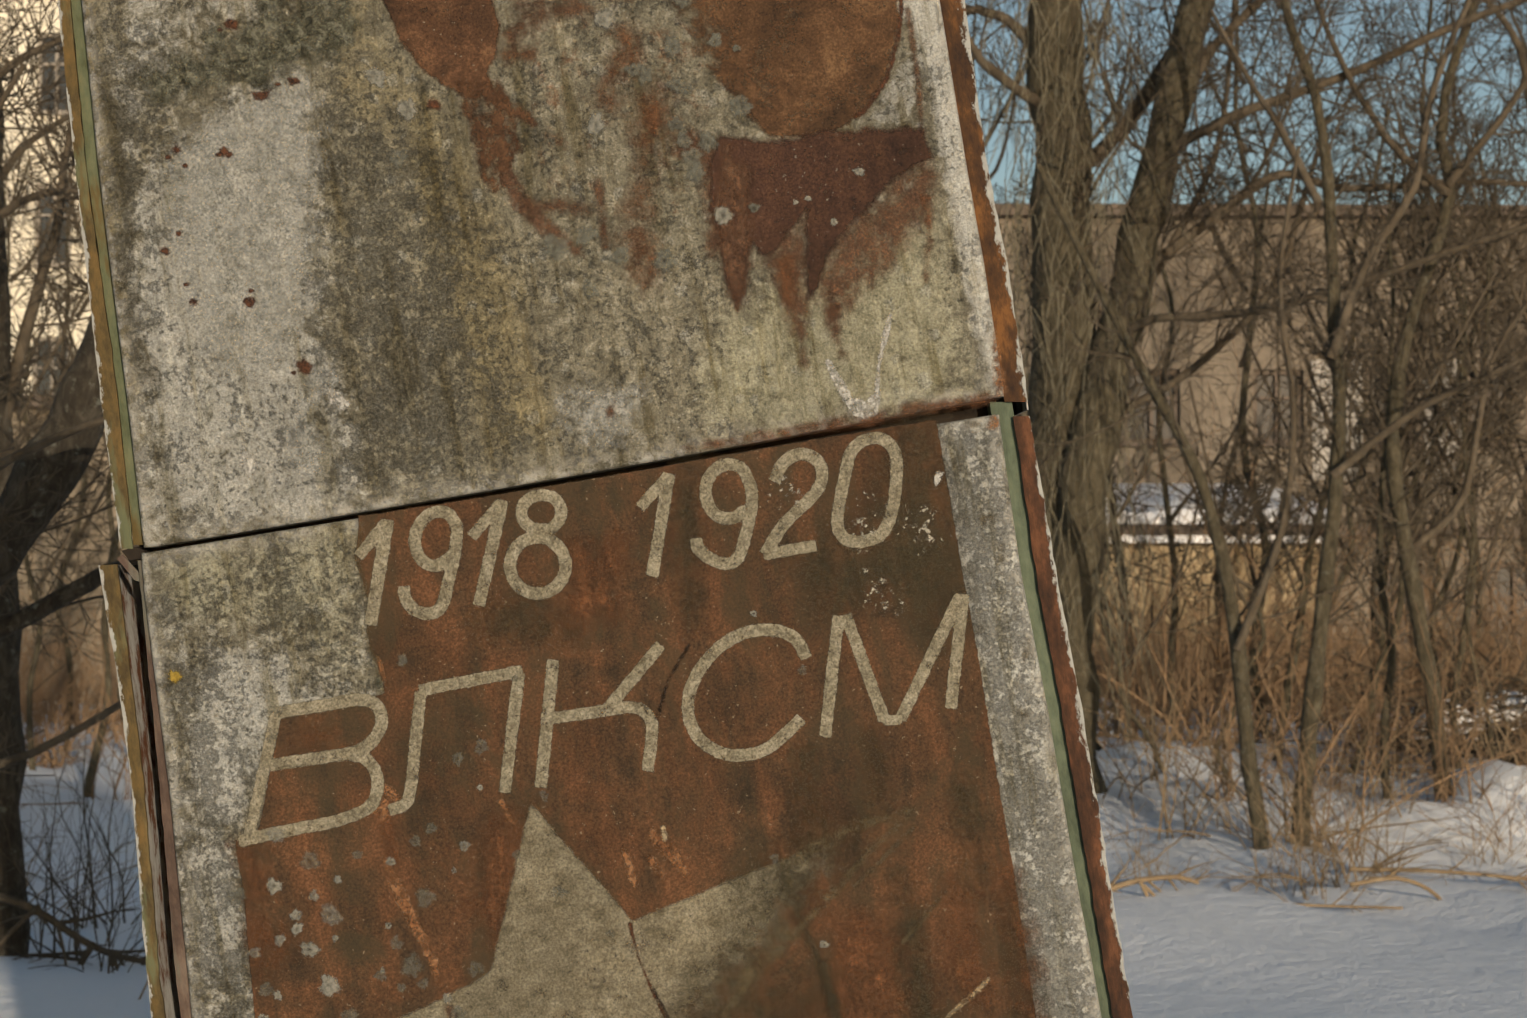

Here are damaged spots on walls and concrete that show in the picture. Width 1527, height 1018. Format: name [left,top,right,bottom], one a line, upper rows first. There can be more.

rust [217,18,238,32]
rust [252,77,300,101]
rust [215,146,233,158]
rust [243,289,255,307]
rust [291,359,313,375]
rust [744,332,1007,442]
peeling [849,492,943,616]
crack [628,922,669,1018]